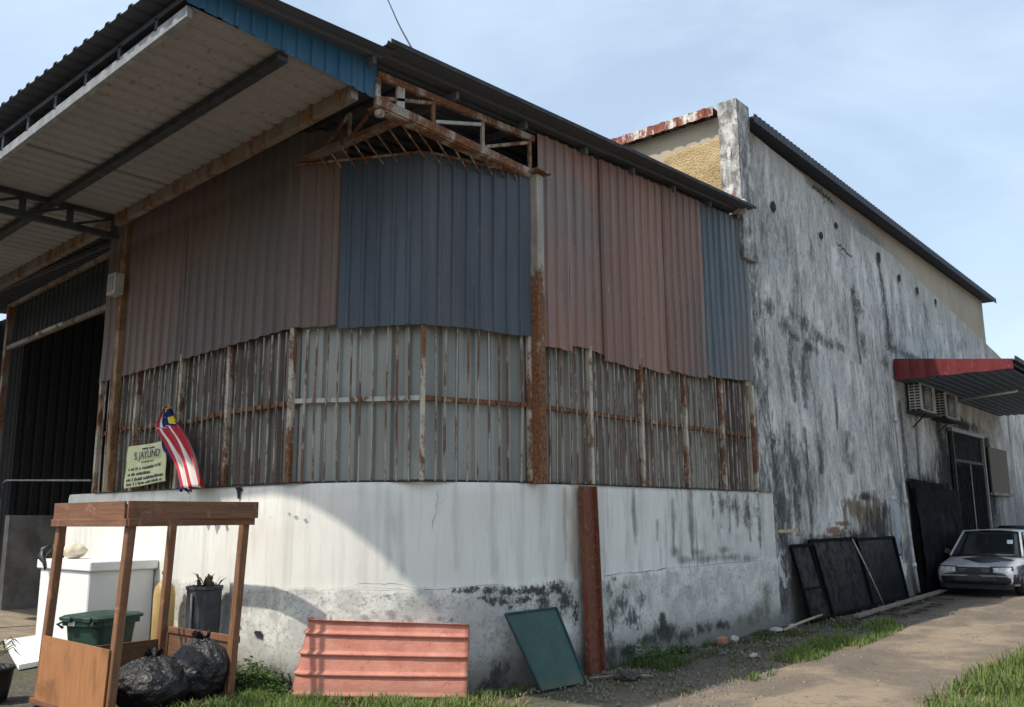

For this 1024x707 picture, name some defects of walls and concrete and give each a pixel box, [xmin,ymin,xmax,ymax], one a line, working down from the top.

water stain [764,268,867,475]
water stain [898,400,921,483]
water stain [935,421,954,490]
water stain [984,437,996,516]
water stain [673,489,710,563]
water stain [711,491,761,546]
water stain [770,424,823,613]
water stain [605,577,730,665]